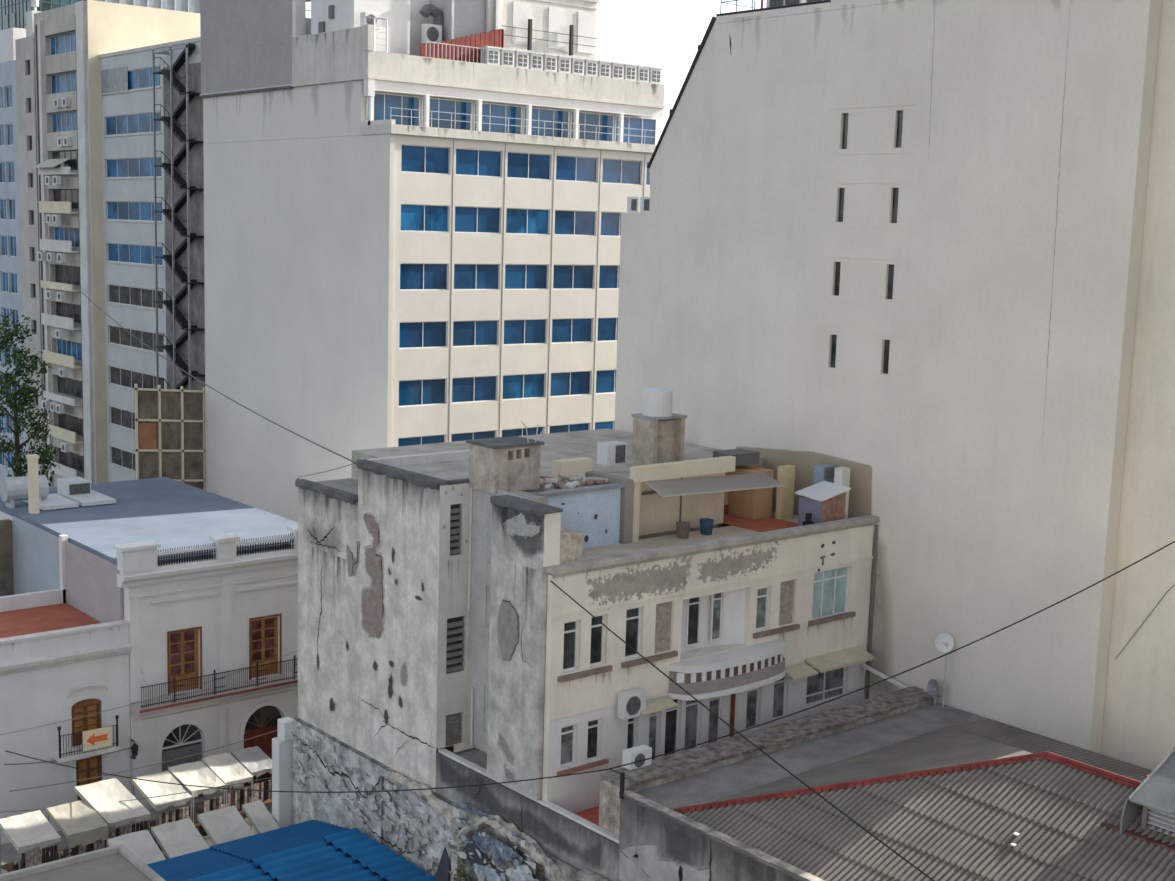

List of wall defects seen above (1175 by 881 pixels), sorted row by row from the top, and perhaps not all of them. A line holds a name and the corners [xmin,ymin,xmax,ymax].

peeling [503,513,542,538]
crack [307,527,340,663]
spalling [346,512,398,640]
peeling [586,544,780,606]
spalling [497,597,520,663]